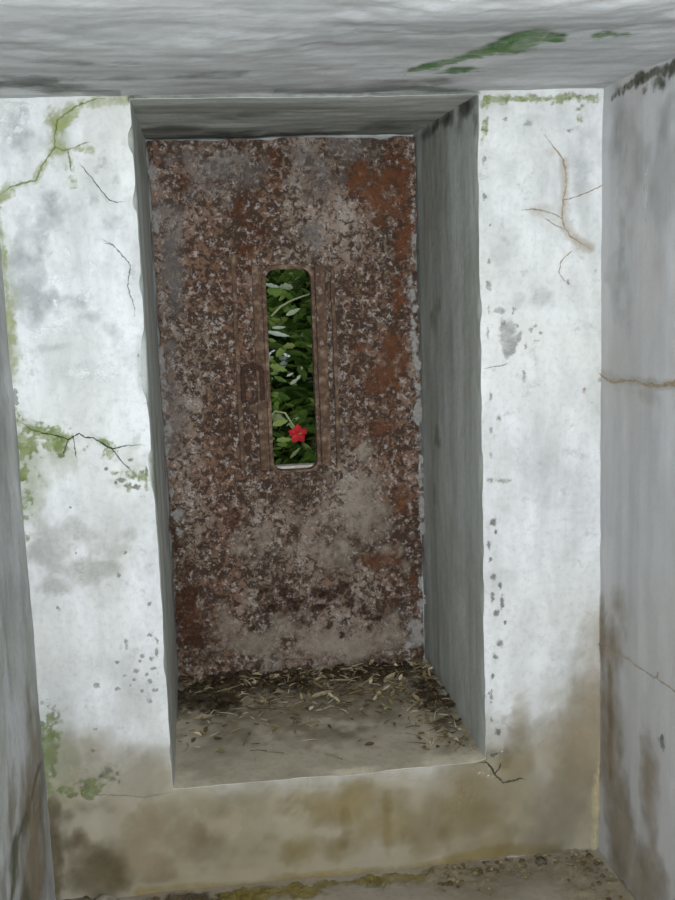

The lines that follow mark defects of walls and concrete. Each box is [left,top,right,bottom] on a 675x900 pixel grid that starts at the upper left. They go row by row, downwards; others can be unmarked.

corrosion [342,151,417,260]
crack [599,373,675,387]
corrosion [174,562,203,646]
water stain [11,701,631,900]
crack [481,762,526,783]